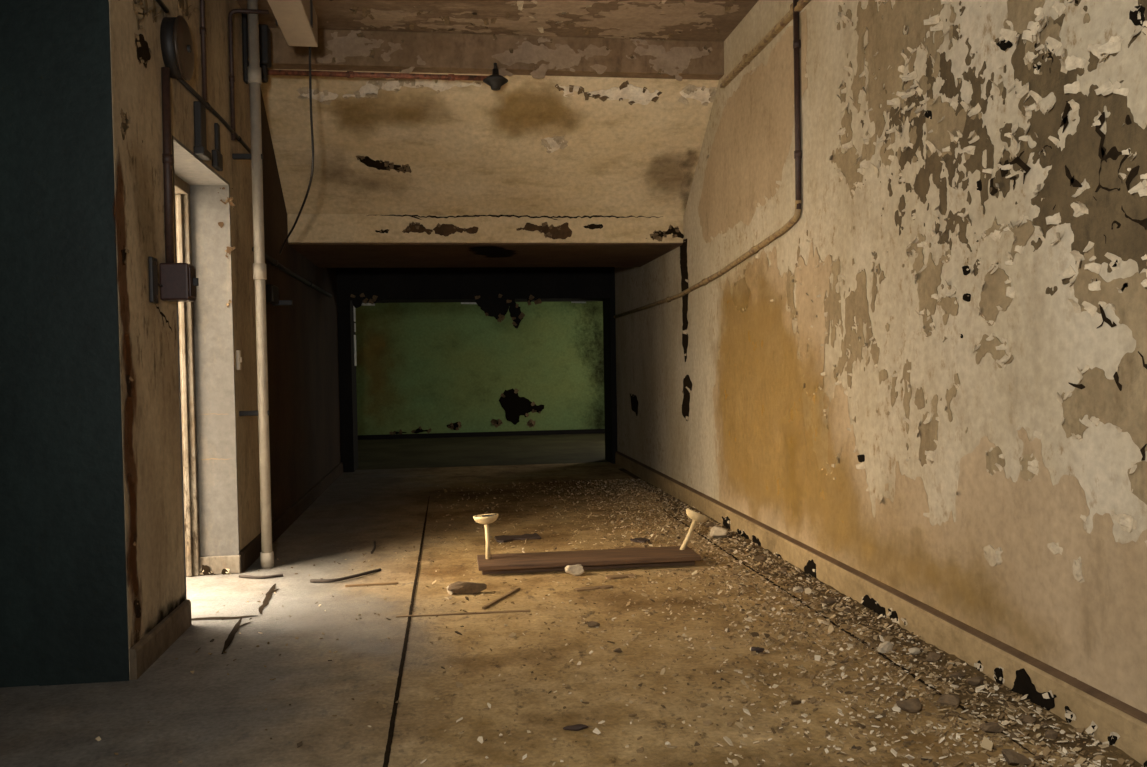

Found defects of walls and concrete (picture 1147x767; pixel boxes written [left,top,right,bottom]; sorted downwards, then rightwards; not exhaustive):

water stain [497,94,573,135]
peeling [296,0,808,243]
spalling [490,388,544,428]
spalling [646,224,692,421]
water stain [720,283,890,565]
peeling [713,230,1147,714]
peeling [829,0,1147,505]
spalling [974,660,1076,724]
spalling [1085,721,1120,746]